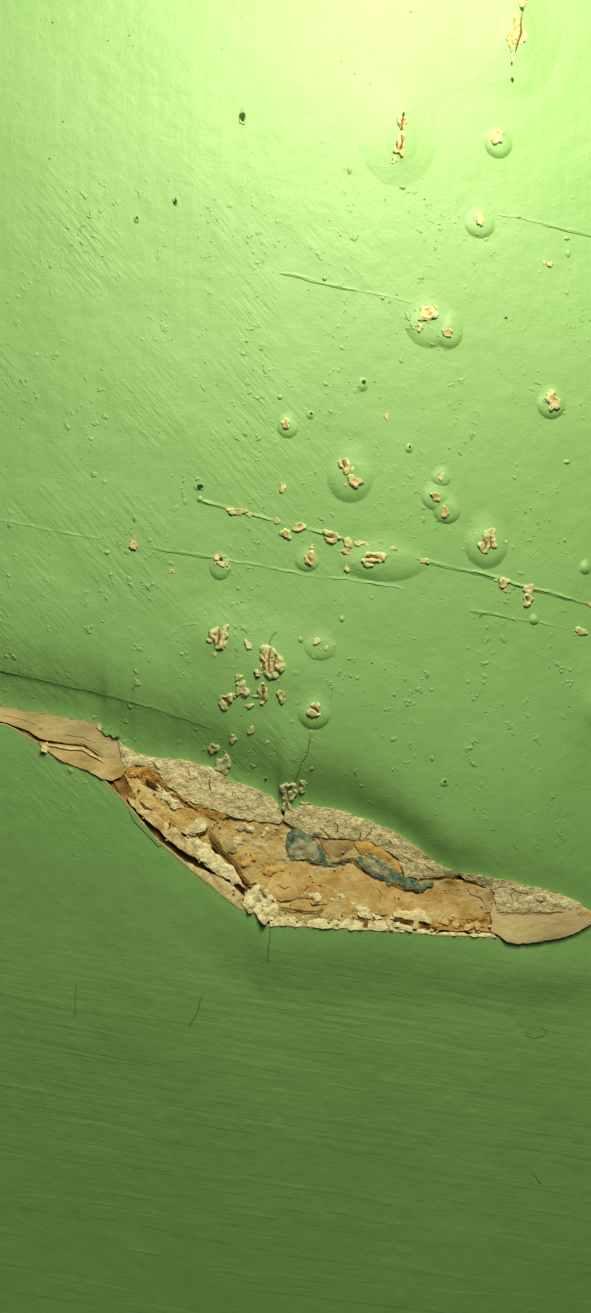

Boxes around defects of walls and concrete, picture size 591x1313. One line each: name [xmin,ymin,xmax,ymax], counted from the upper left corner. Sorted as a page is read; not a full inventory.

crack [496,213,591,237]
crack [278,271,414,304]
crack [0,518,406,589]
crack [199,499,346,540]
crack [415,557,591,630]
spalling [206,624,286,711]
peeling [0,705,591,944]